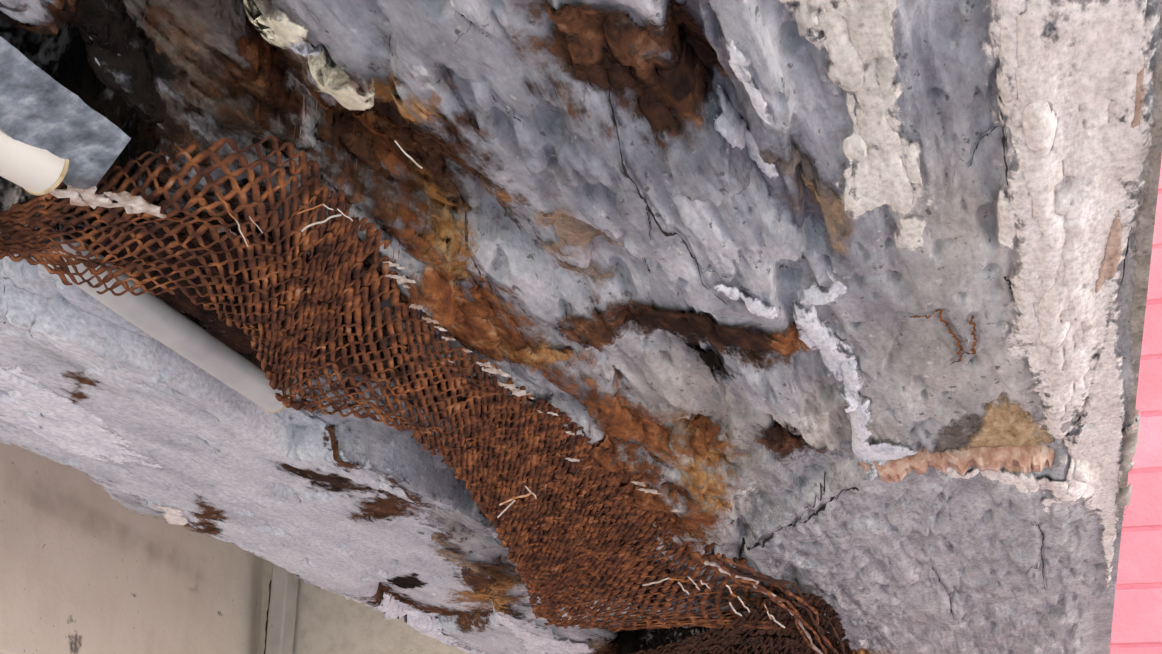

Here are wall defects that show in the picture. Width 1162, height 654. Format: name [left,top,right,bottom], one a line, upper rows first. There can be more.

corrosion [0,177,42,211]
corrosion [62,371,100,403]
spalling [0,0,375,241]
peeling [0,254,770,654]
corrosion [80,0,826,654]
crack [608,91,743,305]
crack [736,472,859,568]
corrosion [799,165,852,253]
peeling [653,0,1160,611]